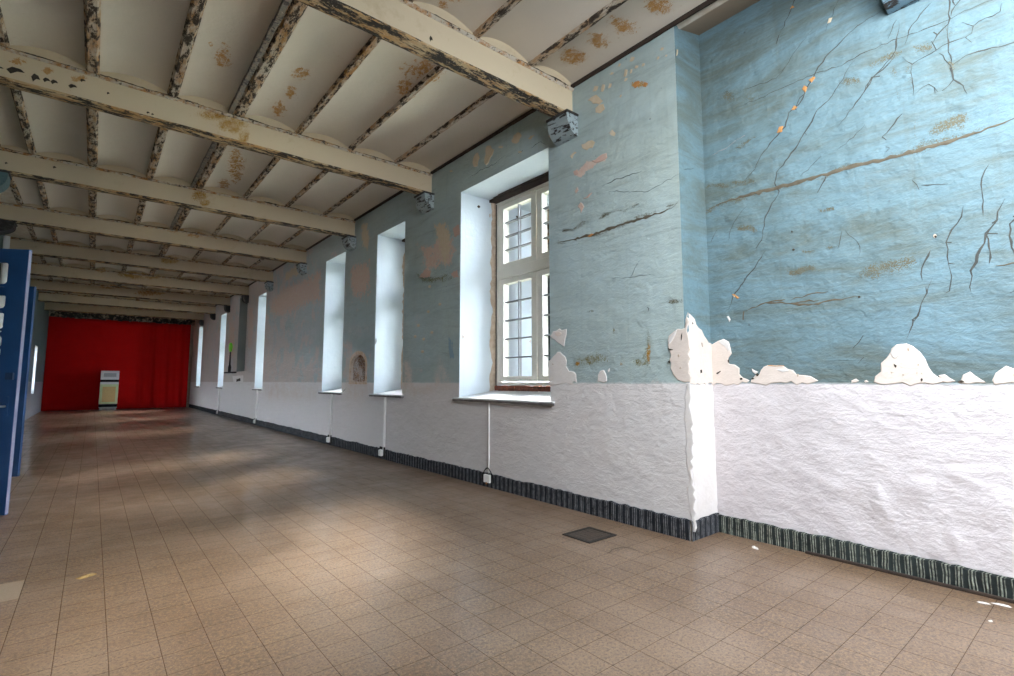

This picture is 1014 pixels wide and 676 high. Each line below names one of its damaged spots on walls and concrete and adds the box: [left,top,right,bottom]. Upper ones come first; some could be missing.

peeling [0,67,85,88]
crack [607,168,693,192]
crack [711,0,1014,337]
peeling [548,328,577,386]
peeling [668,313,818,386]
peeling [851,343,1014,386]